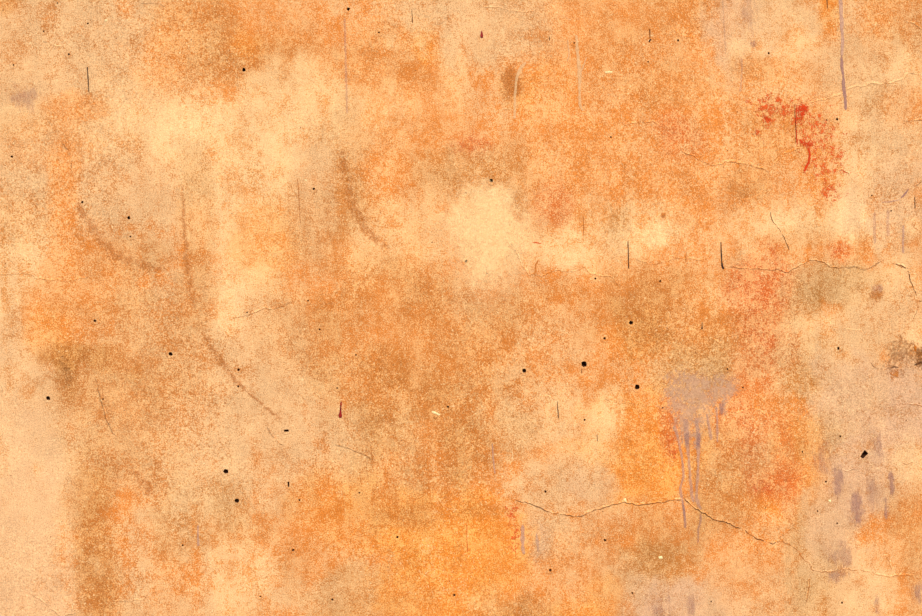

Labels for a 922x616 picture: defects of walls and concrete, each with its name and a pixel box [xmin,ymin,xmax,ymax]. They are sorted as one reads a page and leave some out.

corrosion [746,78,852,203]
crack [731,213,922,322]
crack [410,491,920,604]